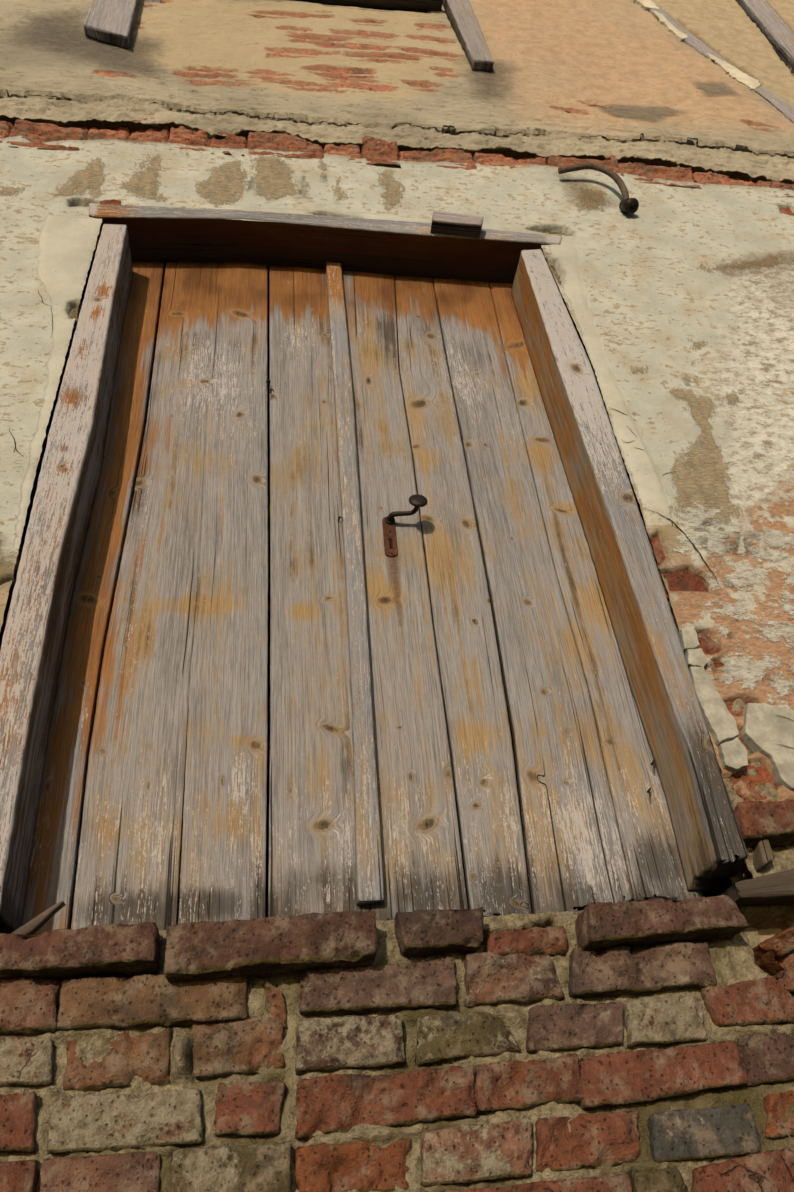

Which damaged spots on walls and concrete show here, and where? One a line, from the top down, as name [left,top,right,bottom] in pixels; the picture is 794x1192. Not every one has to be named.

flaking render [174,12,458,93]
peeling [630,0,689,42]
peeling [706,53,761,92]
flaking render [0,118,794,216]
peeling [697,253,777,273]
peeling [646,339,794,802]